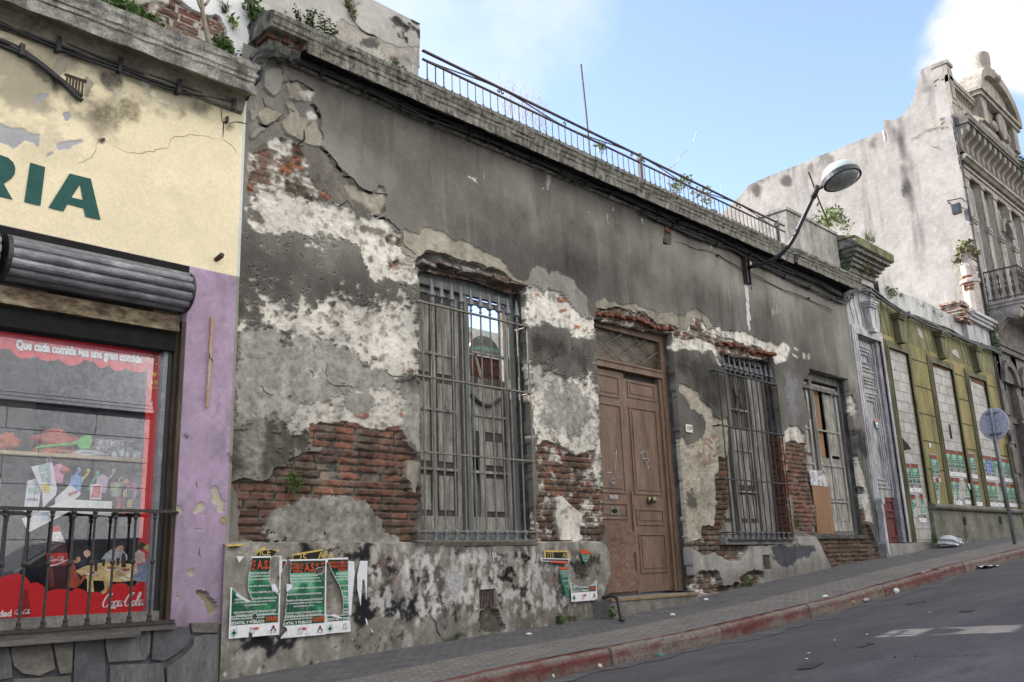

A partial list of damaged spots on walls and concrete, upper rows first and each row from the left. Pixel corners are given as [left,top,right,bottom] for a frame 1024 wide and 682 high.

peeling [0,122,84,157]
leakage [101,72,122,87]
crack [77,79,416,254]
flaking render [176,60,813,652]
flaking render [771,421,880,567]